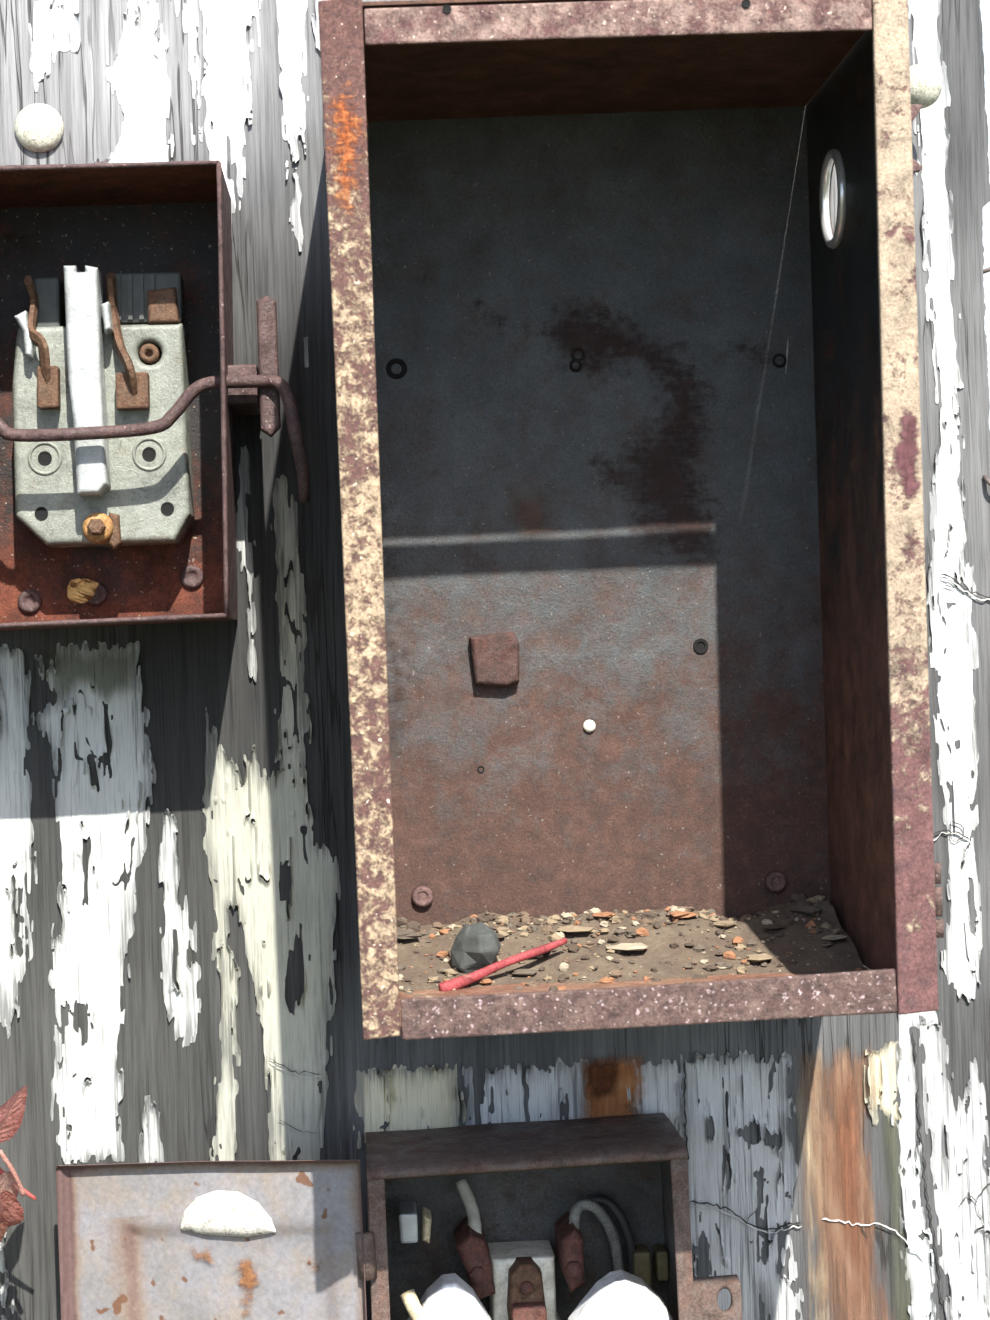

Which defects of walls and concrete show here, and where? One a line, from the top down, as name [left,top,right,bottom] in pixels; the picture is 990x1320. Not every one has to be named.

peeling [29,0,81,92]
peeling [90,0,320,252]
corrosion [329,83,361,208]
corrosion [893,410,921,498]
peeling [908,0,983,1003]
peeling [0,446,341,1165]
corrosion [239,1260,259,1313]
crack [682,1062,690,1160]
peeling [627,1050,804,1320]
crack [691,1032,990,1307]
corrosion [803,1054,886,1320]
peeling [863,1009,990,1320]